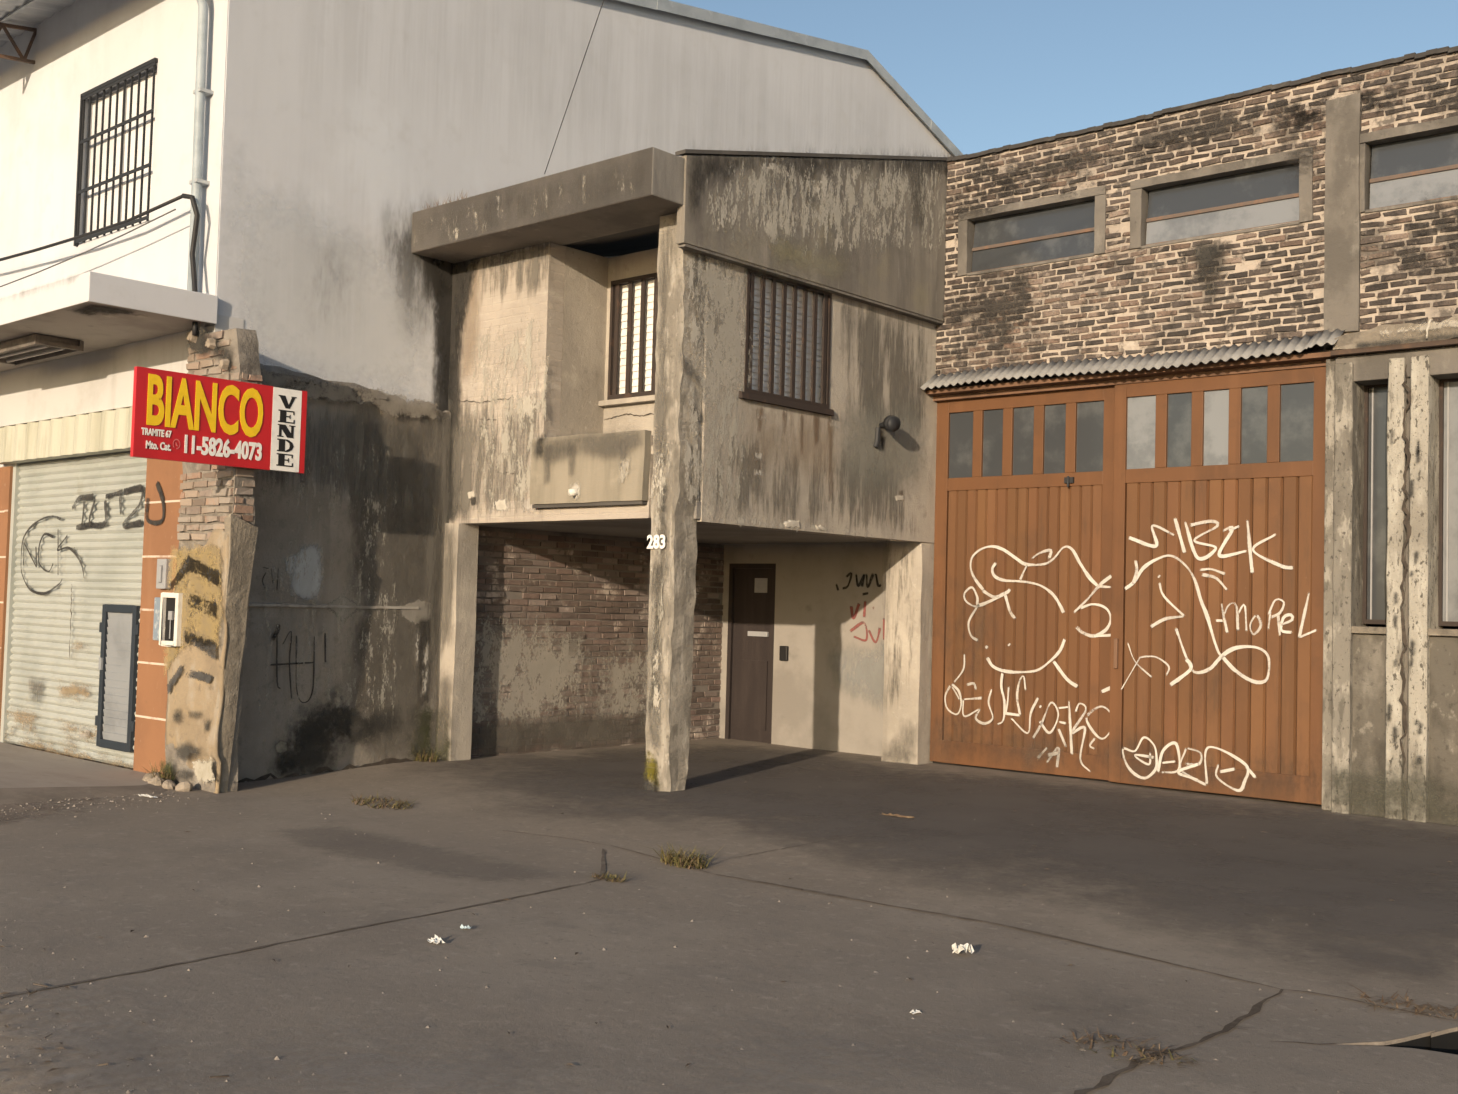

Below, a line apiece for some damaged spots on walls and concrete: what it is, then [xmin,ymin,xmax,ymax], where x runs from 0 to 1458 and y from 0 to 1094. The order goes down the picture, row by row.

leakage [1132,98,1325,164]
leakage [1360,79,1458,113]
leakage [953,143,1119,215]
leakage [1393,205,1458,275]
leakage [946,270,1035,360]
leakage [399,232,532,519]
leakage [847,410,917,488]
flaking render [177,462,255,541]
leakage [280,416,449,773]
spalling [175,744,215,783]
leakage [471,616,1458,972]
crack [0,830,1455,1094]